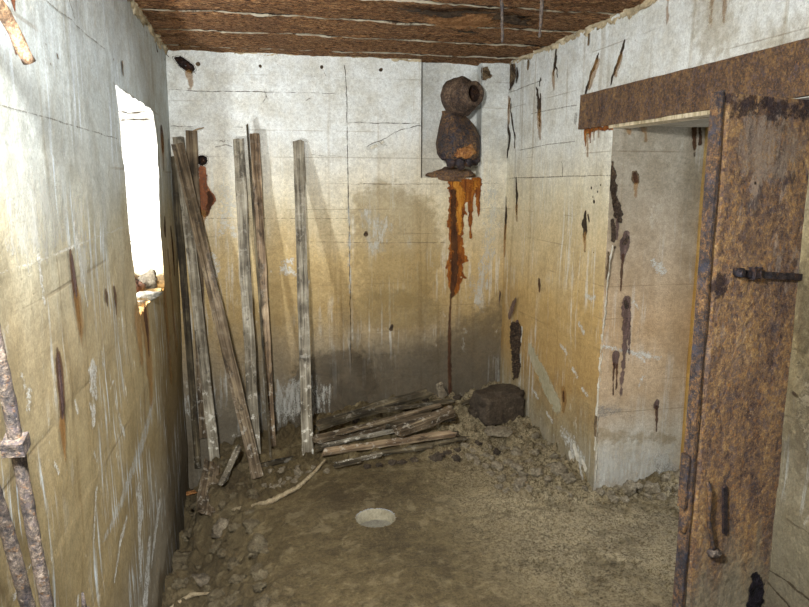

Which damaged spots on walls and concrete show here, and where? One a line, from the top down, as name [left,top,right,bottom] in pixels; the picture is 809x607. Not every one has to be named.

corrosion [584,126,613,146]
corrosion [198,166,216,218]
corrosion [445,177,482,394]
corrosion [55,347,66,455]